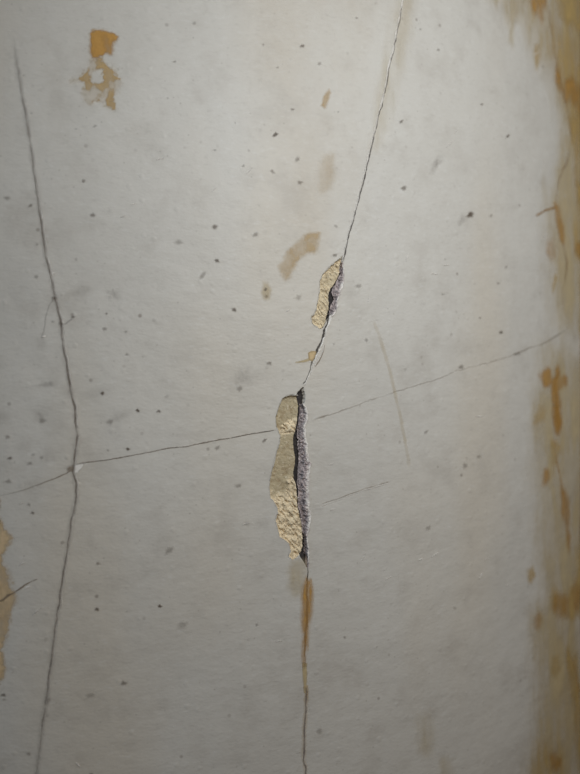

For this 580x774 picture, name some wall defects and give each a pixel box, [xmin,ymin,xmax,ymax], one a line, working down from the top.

crack [343,0,403,259]
crack [304,315,332,385]
spalling [311,256,345,329]
spalling [269,389,312,568]
leakage [0,523,14,679]
rust [302,581,312,648]